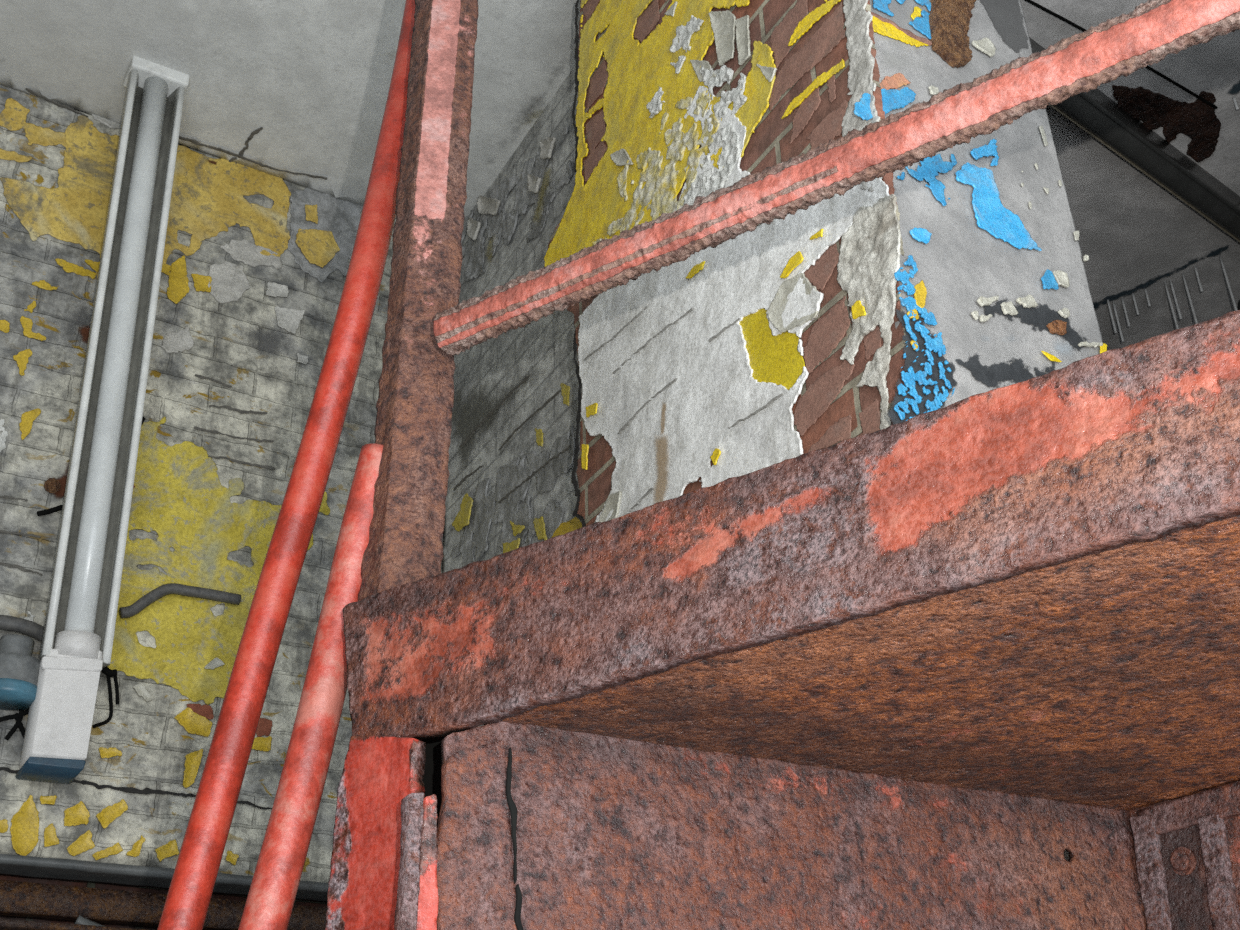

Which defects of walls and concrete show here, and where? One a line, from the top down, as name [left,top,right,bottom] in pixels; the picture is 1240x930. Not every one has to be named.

peeling [0,98,121,279]
peeling [460,0,939,285]
peeling [161,145,363,334]
peeling [448,139,1042,567]
spalling [971,269,1070,322]
rust [1046,320,1067,335]
rust [655,405,667,502]
peeling [107,417,282,788]
crack [0,766,19,774]
peeling [0,795,179,862]
crack [71,779,196,797]
crack [237,801,272,810]